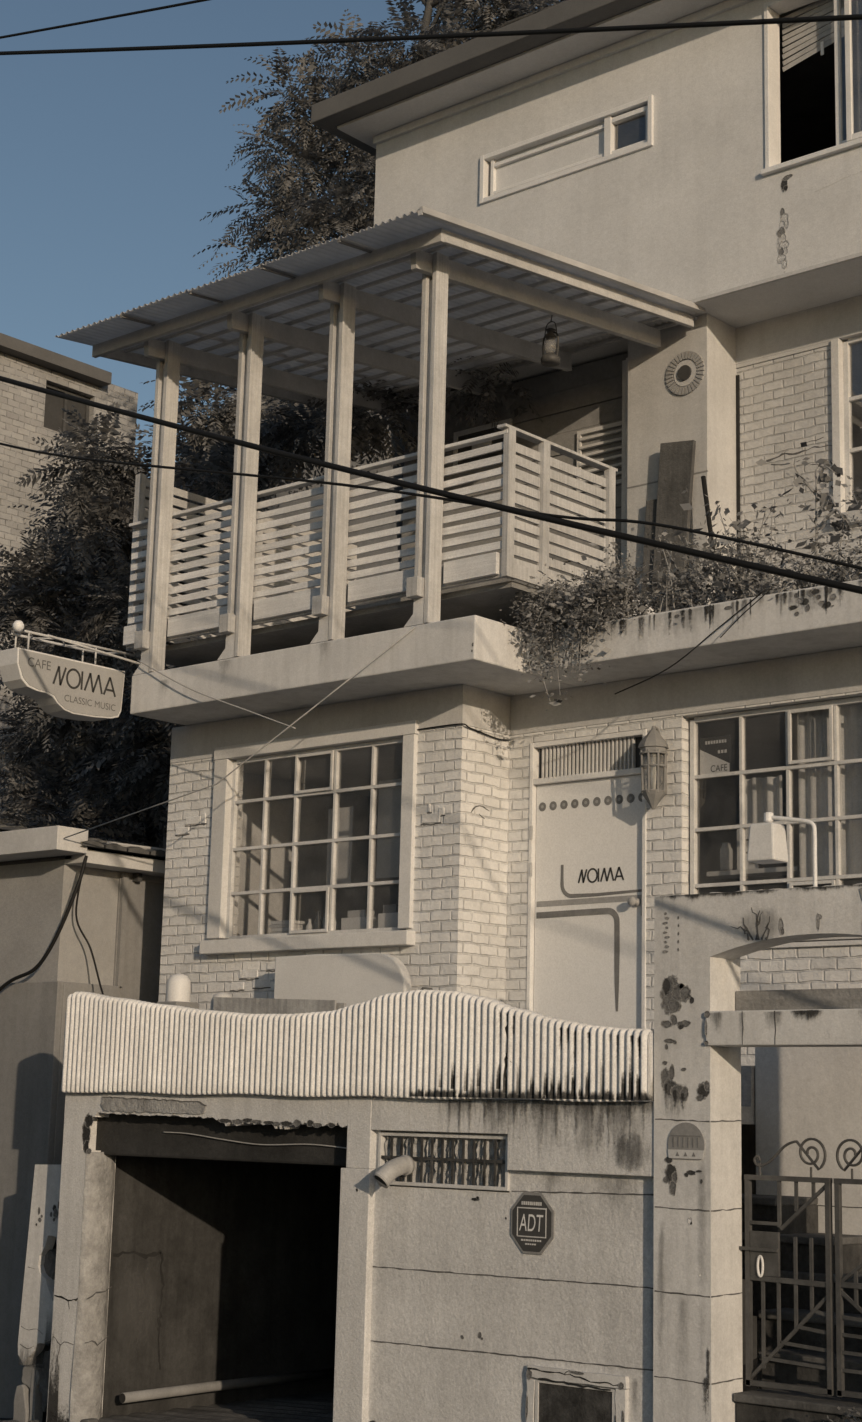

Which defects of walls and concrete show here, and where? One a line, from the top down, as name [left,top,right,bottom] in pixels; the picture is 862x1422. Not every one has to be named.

peeling [777,174,793,269]
leakage [603,605,714,633]
leakage [732,586,842,621]
peeling [660,975,710,1101]
spalling [82,1113,94,1154]
spalling [219,1118,335,1128]
leakage [410,1067,684,1165]
peeling [663,1157,703,1196]
spalling [35,1202,59,1226]